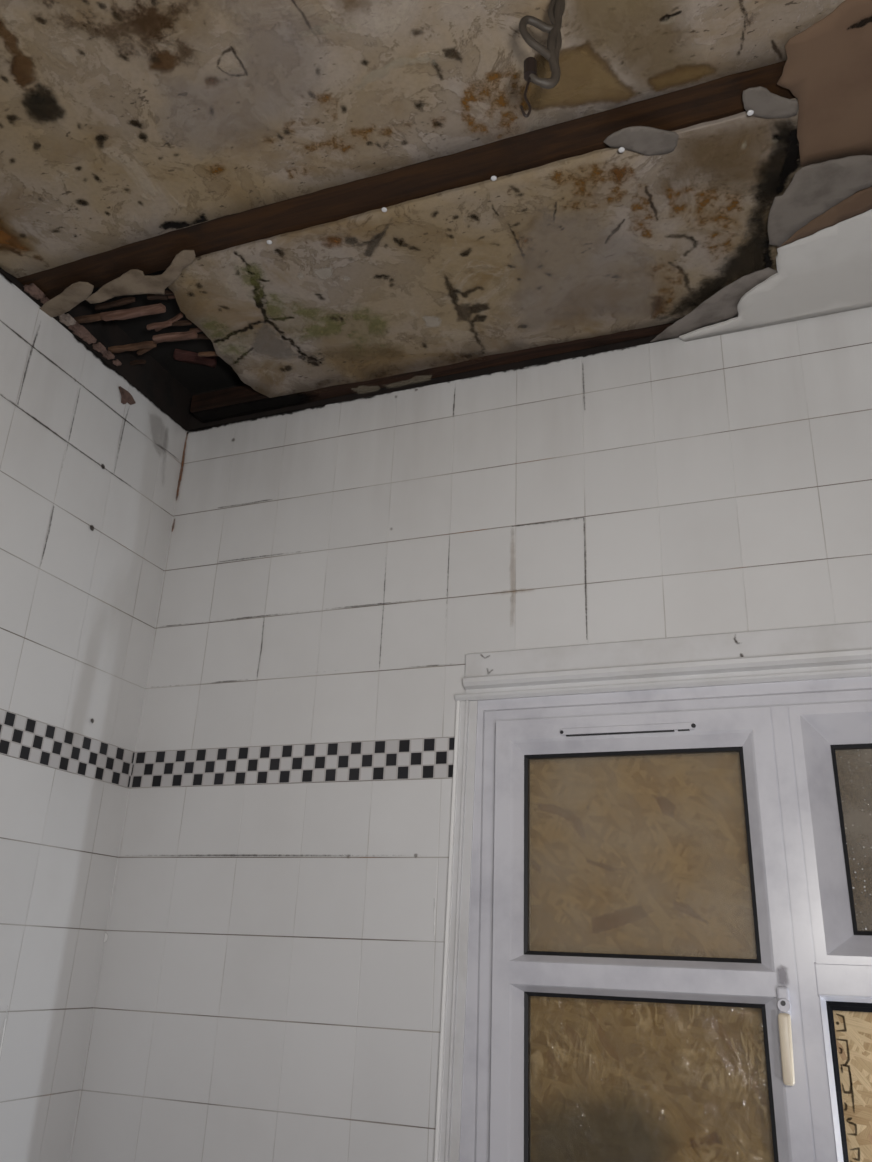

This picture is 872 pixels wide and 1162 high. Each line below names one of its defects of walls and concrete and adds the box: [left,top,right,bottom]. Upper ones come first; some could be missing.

water stain [0,21,64,126]
water stain [61,0,193,70]
peeling [206,47,248,85]
water stain [433,48,461,79]
water stain [461,0,716,138]
crack [772,41,782,59]
peeling [346,225,388,257]
water stain [661,121,795,319]
crack [214,252,325,367]
flaking render [445,277,489,347]
flaking render [650,267,778,342]